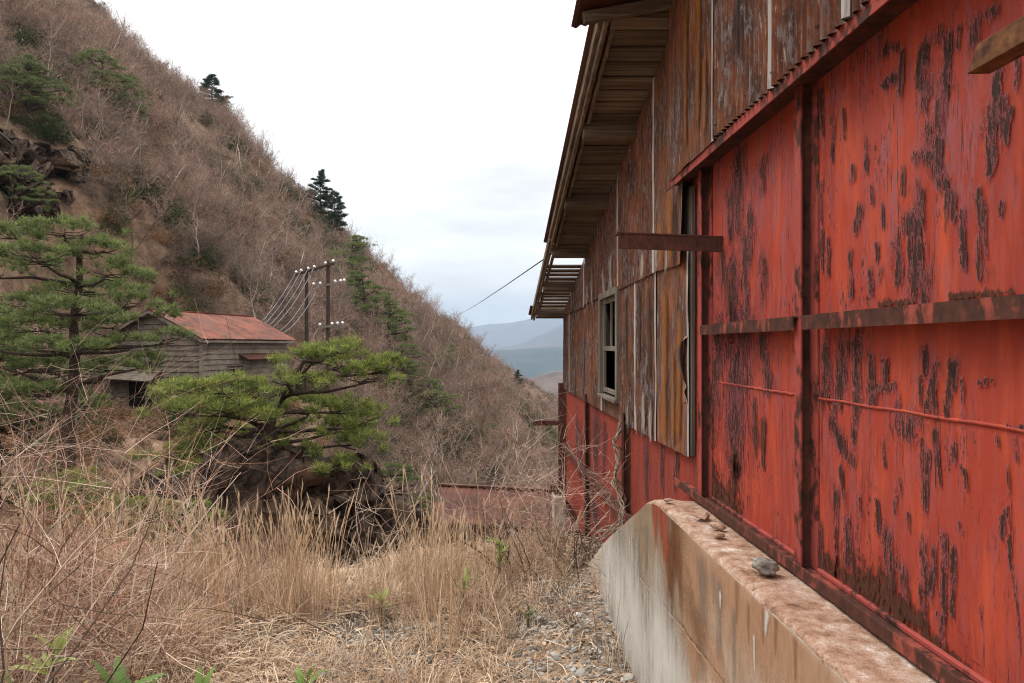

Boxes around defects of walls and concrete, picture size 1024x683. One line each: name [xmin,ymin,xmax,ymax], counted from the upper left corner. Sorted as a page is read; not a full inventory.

peeling [818,87,846,164]
peeling [847,2,1019,305]
damp [625,290,650,376]
rust [661,292,682,440]
rust [948,284,1014,301]
rust [712,422,744,515]
rust [653,504,829,683]
rust [813,542,971,669]